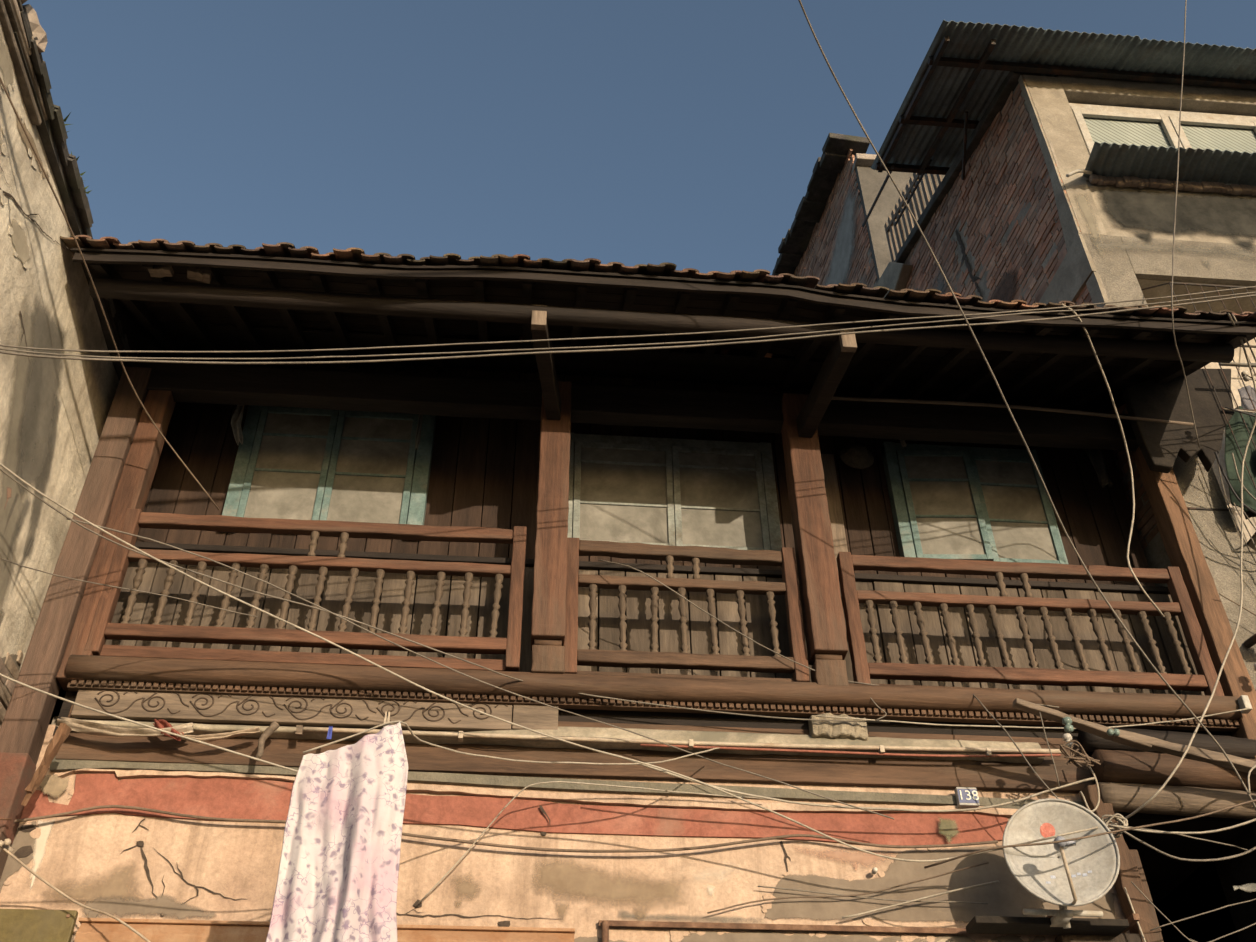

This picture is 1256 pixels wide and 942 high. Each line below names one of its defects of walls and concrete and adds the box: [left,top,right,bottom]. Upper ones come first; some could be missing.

peeling [0,36,53,187]
crack [0,166,64,248]
water stain [1077,188,1256,265]
crack [122,818,243,917]